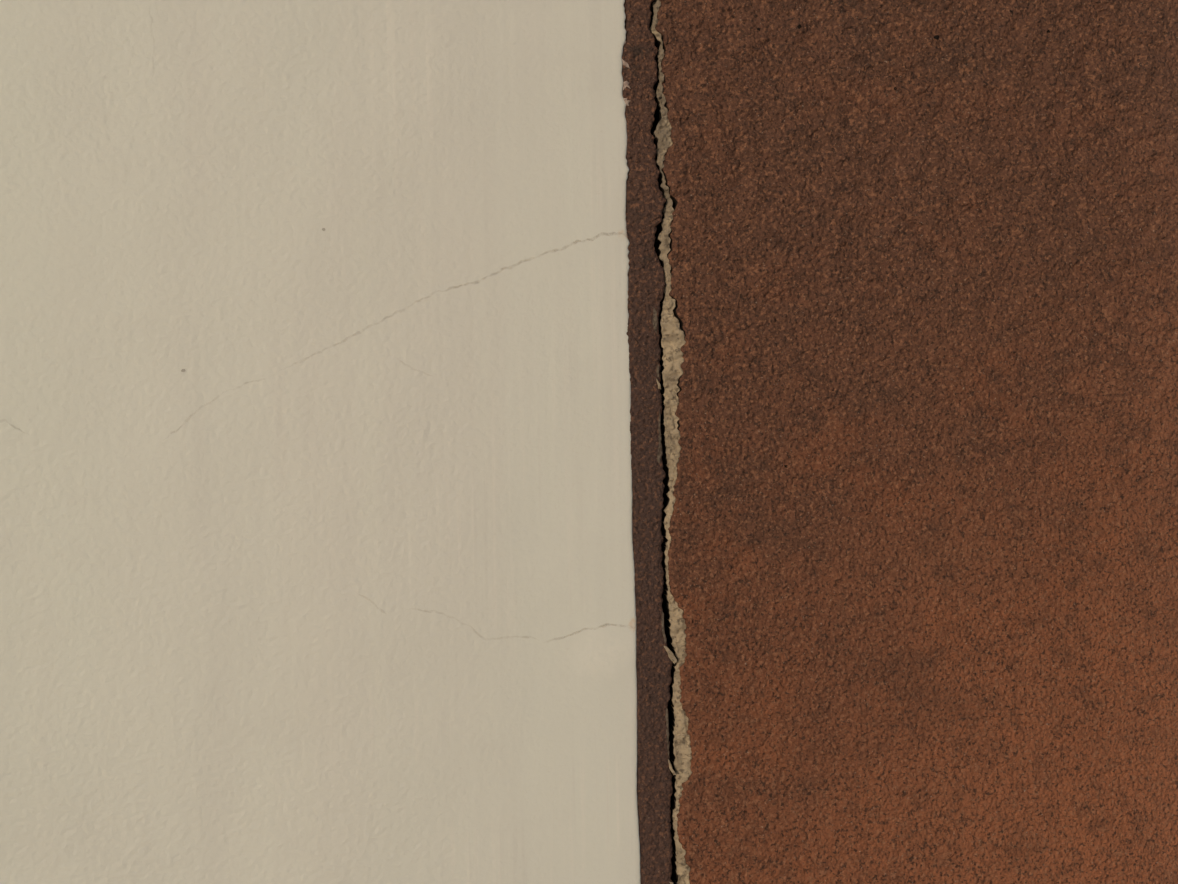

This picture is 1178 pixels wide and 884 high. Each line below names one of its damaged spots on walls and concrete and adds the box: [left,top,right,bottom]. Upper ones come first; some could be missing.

crack [649,0,686,884]